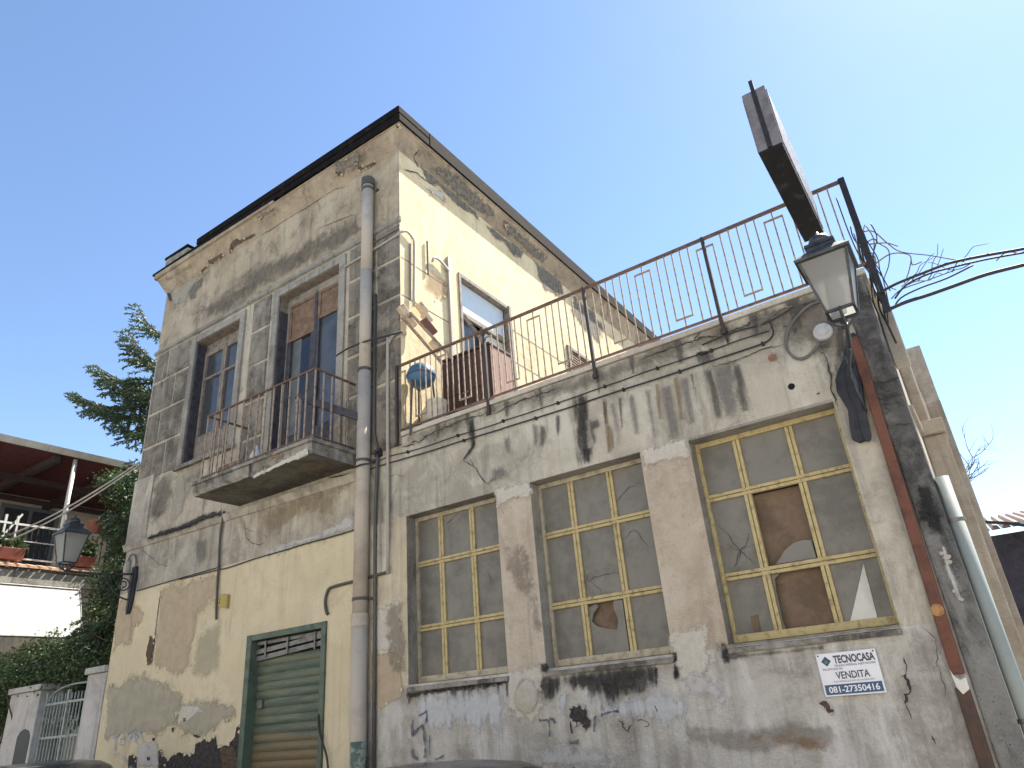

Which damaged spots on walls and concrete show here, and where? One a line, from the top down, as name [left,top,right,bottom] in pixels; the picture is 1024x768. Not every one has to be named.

peeling [188,234,255,300]
leakage [534,416,559,445]
leakage [574,396,598,463]
leakage [663,388,677,434]
leakage [697,351,747,416]
leakage [269,516,353,554]
peeling [145,575,216,676]
peeling [371,600,403,709]
leakage [541,652,729,728]
crack [901,659,912,719]
spalling [127,700,240,768]